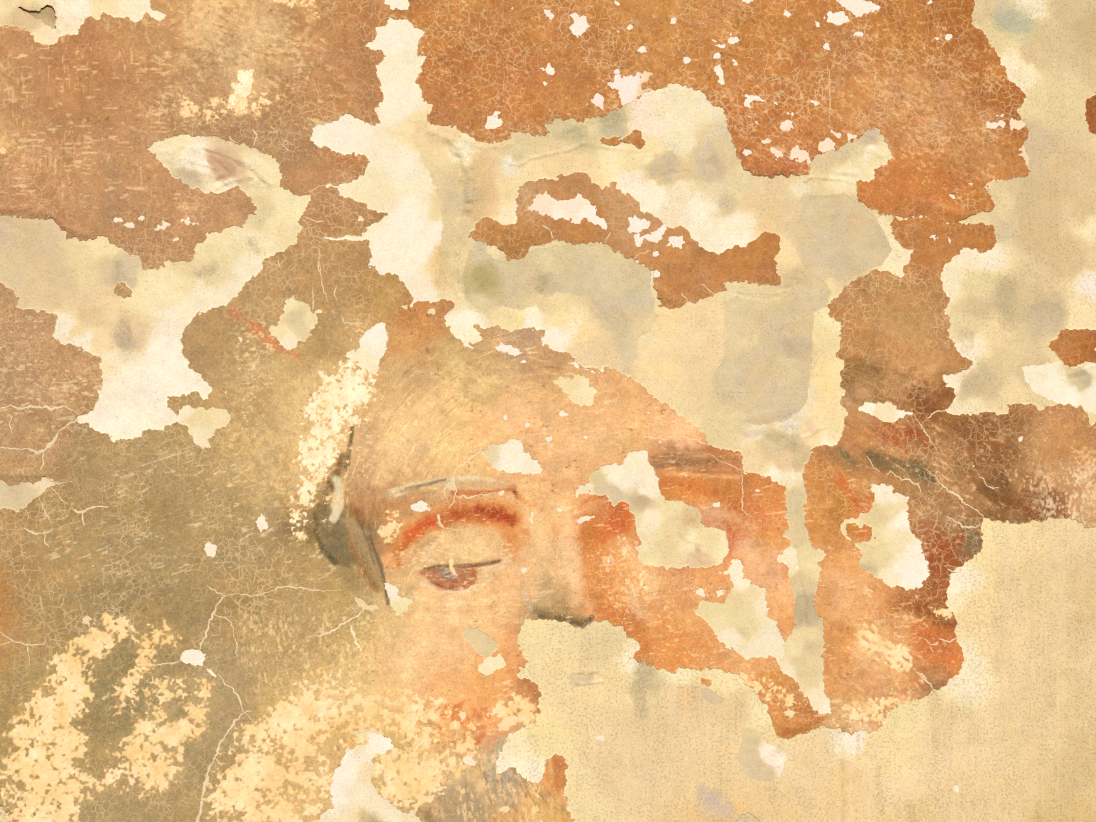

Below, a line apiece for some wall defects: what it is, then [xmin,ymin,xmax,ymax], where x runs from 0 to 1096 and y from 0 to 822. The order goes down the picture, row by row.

peeling [0,0,166,46]
peeling [0,67,311,449]
peeling [269,295,323,350]
peeling [289,322,389,540]
peeling [310,0,1096,536]
crack [0,632,46,664]
peeling [0,613,217,822]
crack [155,586,337,822]
crack [310,611,363,651]
peeling [199,450,1096,822]